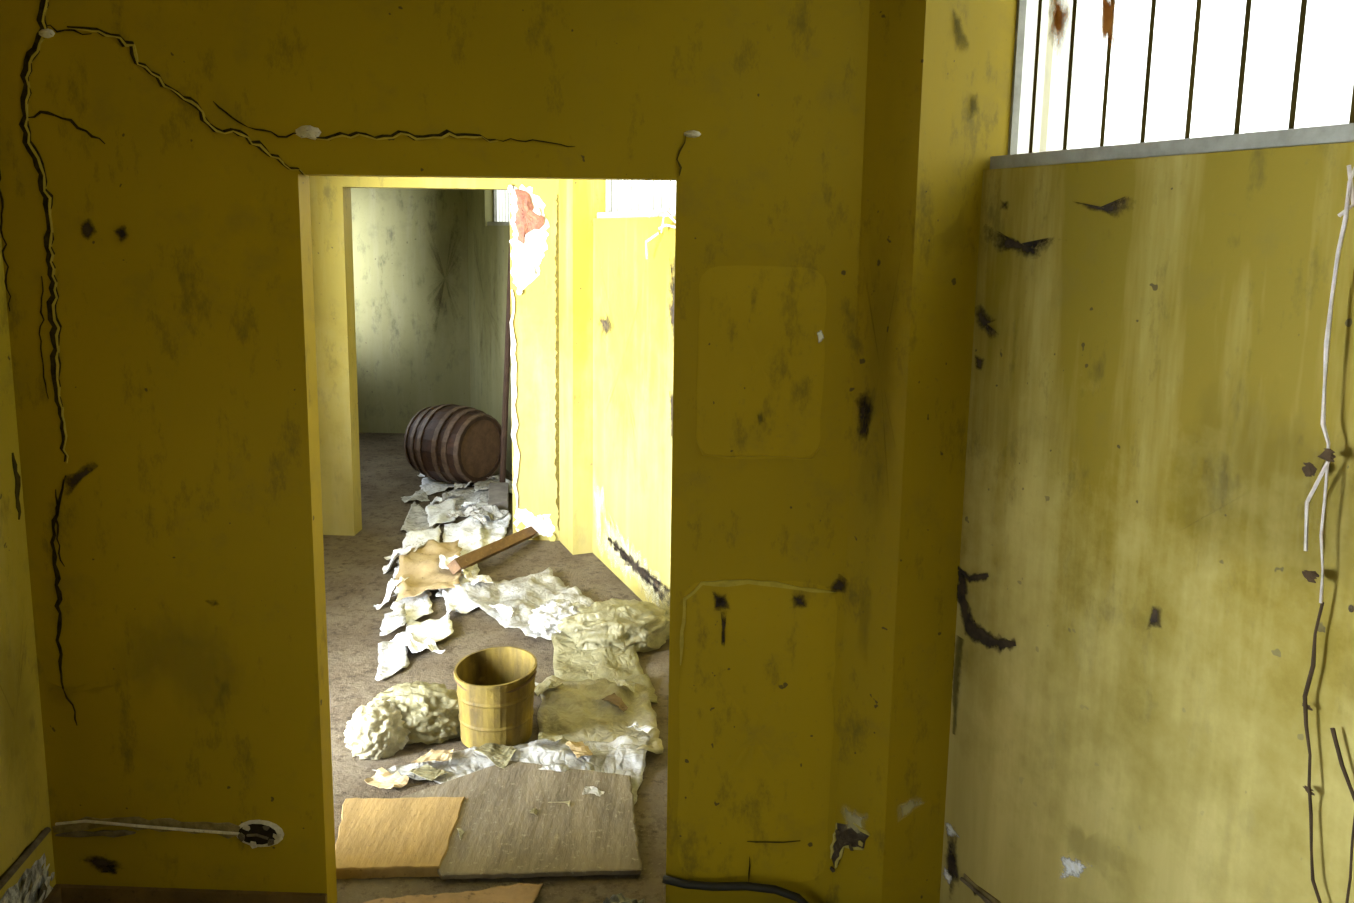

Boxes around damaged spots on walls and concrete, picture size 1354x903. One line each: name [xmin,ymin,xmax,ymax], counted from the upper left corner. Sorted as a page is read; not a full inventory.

crack [0,0,575,725]
flaking render [508,185,556,541]
flaking render [0,853,55,903]